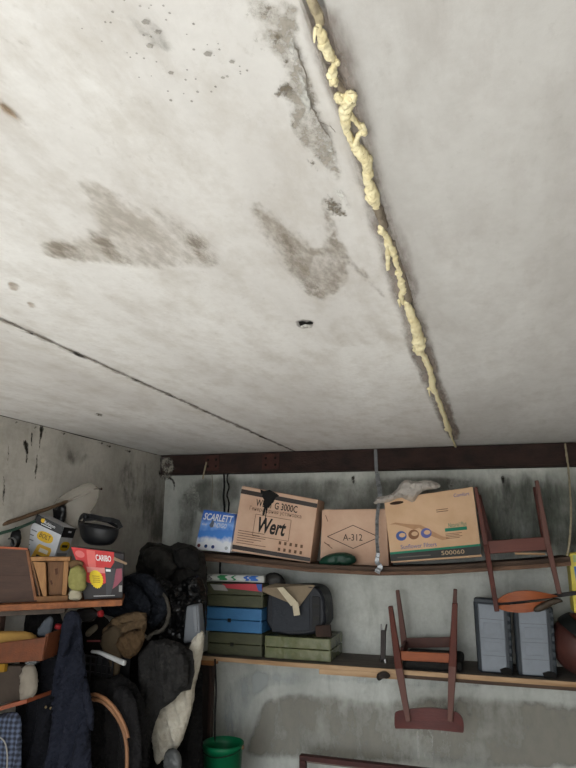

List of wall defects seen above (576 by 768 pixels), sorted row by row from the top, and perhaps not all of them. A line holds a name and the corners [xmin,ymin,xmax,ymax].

crack [294,45,335,138]
damp [318,21,354,90]
damp [384,257,458,440]
damp [248,696,576,768]